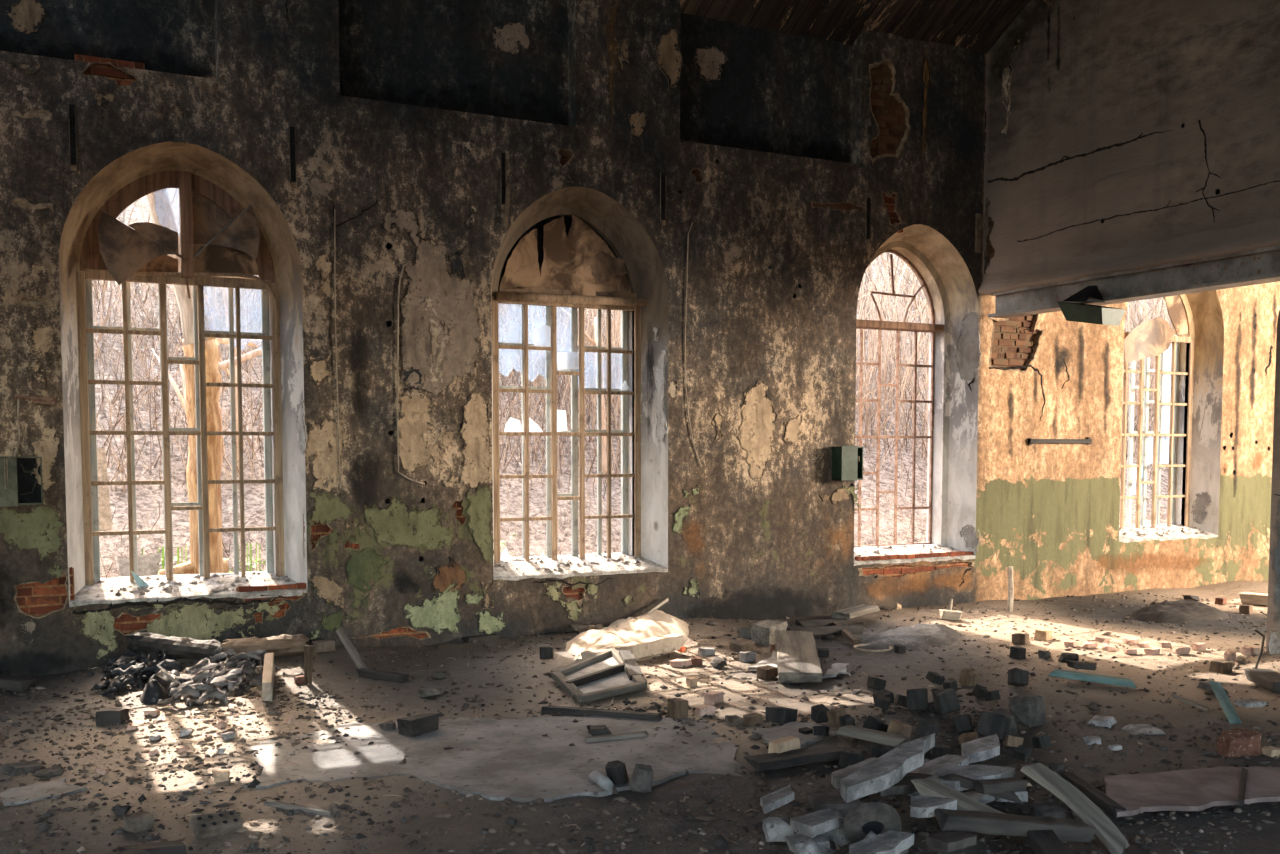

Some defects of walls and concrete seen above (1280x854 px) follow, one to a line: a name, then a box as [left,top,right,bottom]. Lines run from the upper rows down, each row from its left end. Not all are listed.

flaking render [6,0,45,34]
spalling [74,54,145,110]
flaking render [492,22,531,54]
peeling [655,29,729,91]
spalling [869,58,911,163]
crack [987,120,1280,242]
peeling [1,263,54,397]
peeling [296,207,506,640]
water stain [1103,342,1111,427]
water stain [1235,311,1257,494]
peeling [0,425,75,643]
peeling [82,574,344,661]